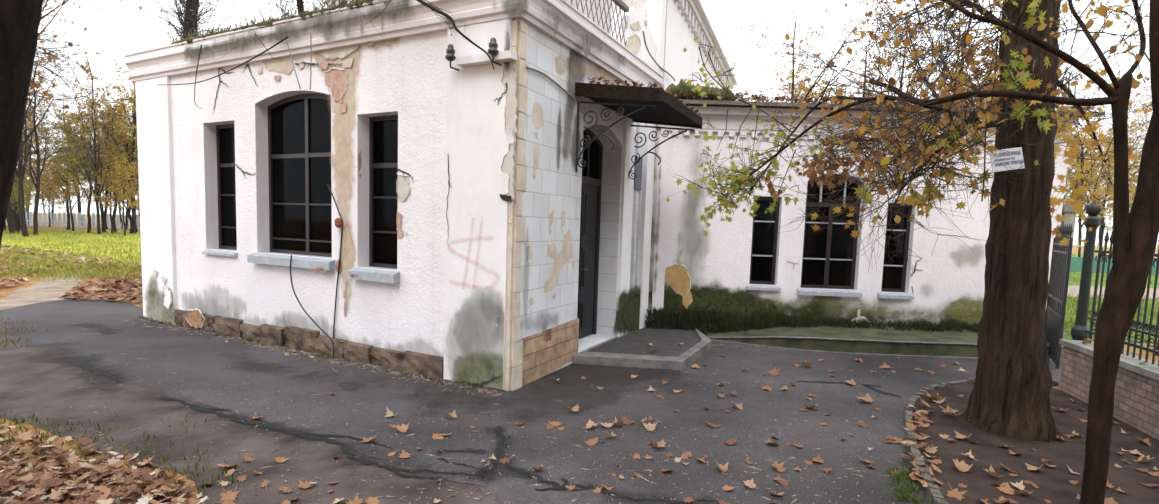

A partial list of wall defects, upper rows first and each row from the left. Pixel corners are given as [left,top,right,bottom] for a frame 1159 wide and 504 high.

peeling [527,211,575,308]
peeling [665,263,693,308]